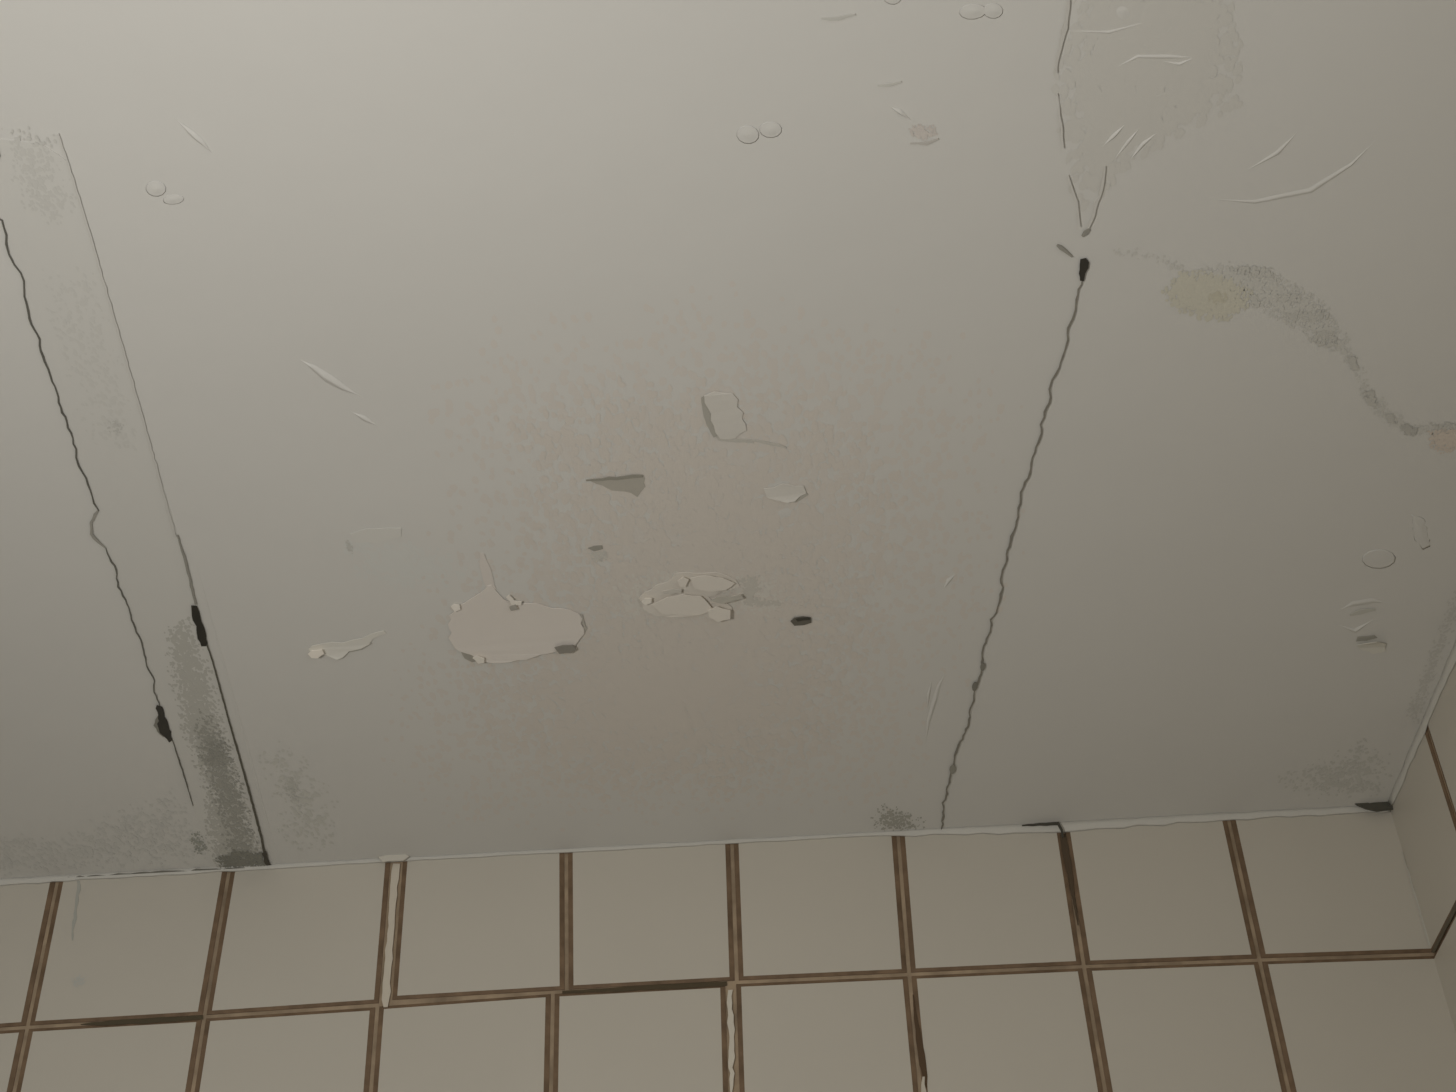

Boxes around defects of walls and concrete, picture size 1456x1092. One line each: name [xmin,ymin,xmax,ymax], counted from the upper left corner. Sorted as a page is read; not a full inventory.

leakage [1113,248,1456,437]
crack [0,219,160,706]
peeling [308,630,386,660]
peeling [448,585,587,664]
peeling [638,572,744,622]
crack [941,228,1090,830]
leakage [0,617,271,940]